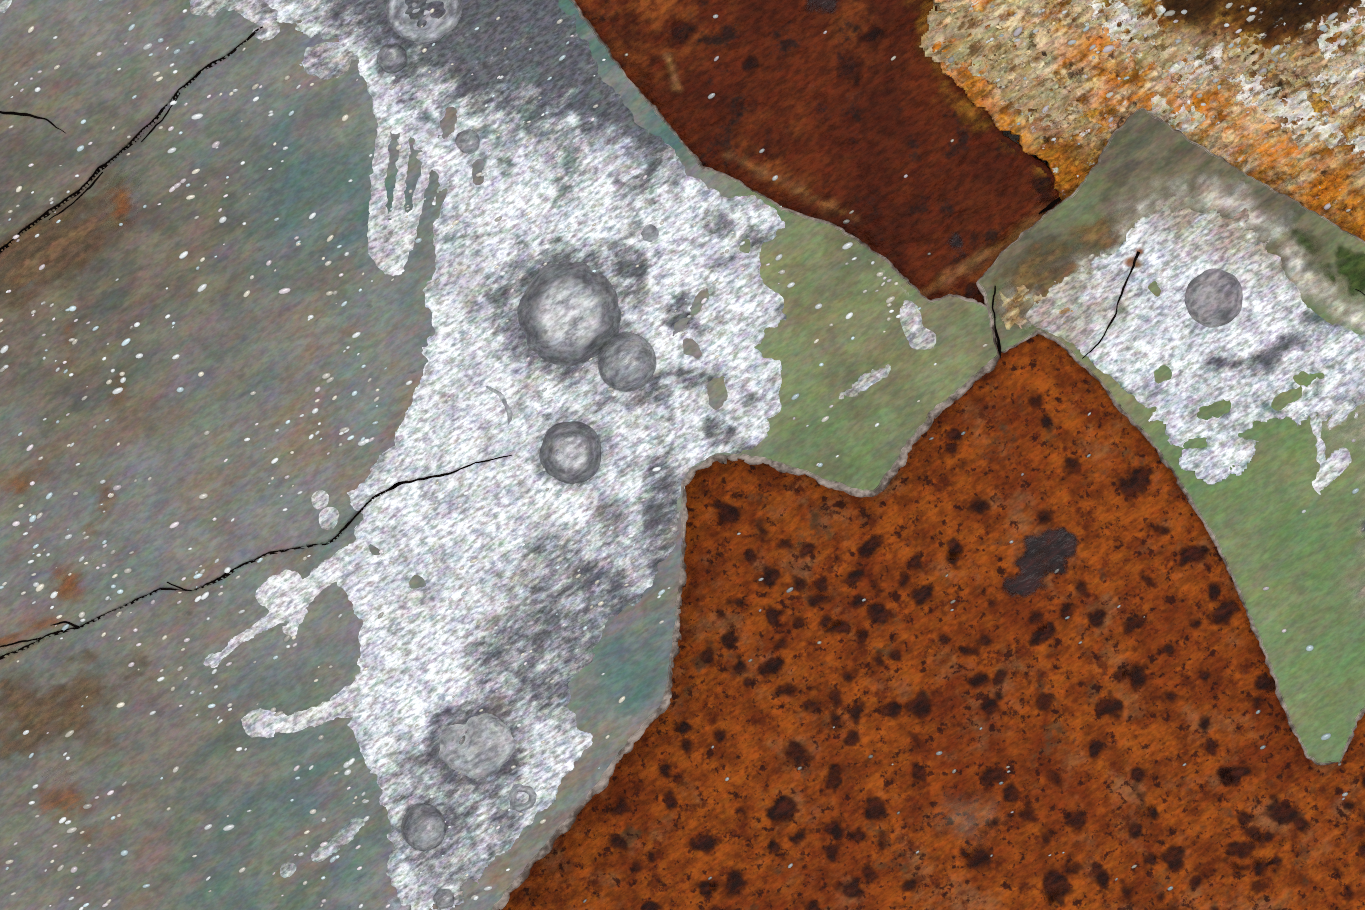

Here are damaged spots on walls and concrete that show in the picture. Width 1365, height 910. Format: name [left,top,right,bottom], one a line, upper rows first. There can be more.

crack [0,19,277,254]
crack [1082,251,1140,359]
water stain [1111,182,1365,330]
crack [0,455,512,660]
corrosion [745,535,892,642]
corrosion [989,511,1088,608]
corrosion [702,599,865,746]
corrosion [767,795,806,853]
corrosion [823,797,887,861]
corrosion [1043,862,1131,905]
corrosion [1144,846,1202,888]
corrosion [1227,799,1308,891]